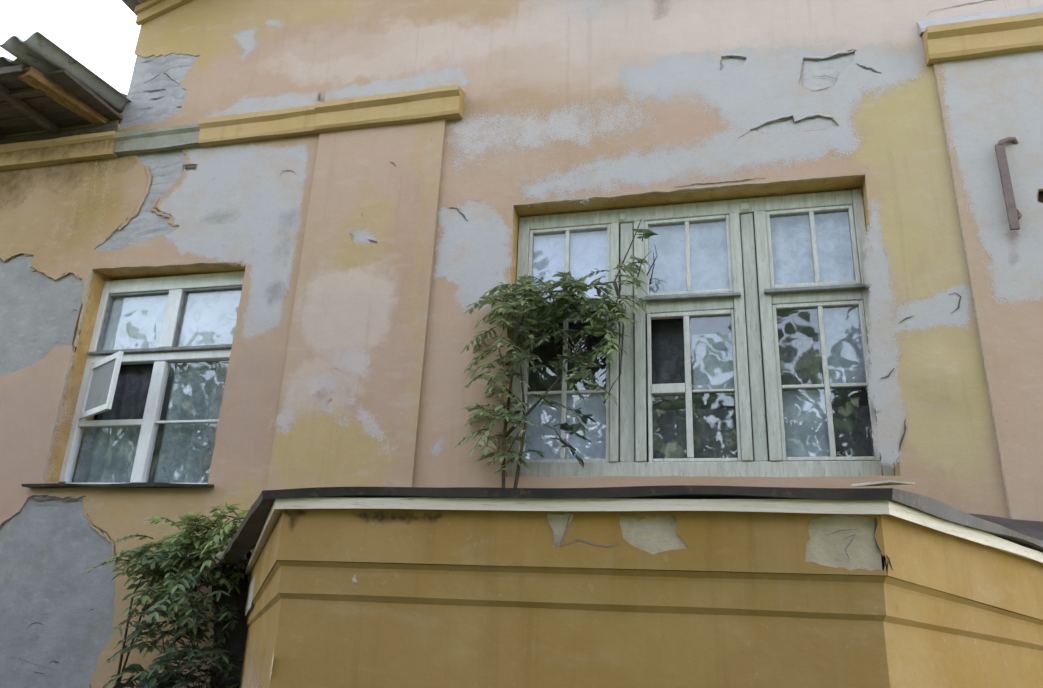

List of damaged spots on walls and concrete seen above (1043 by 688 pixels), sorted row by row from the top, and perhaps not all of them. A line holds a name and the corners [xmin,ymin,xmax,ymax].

spalling [119,53,199,129]
peeling [445,36,1043,311]
peeling [95,142,310,339]
peeling [432,197,517,313]
peeling [860,198,976,470]
spalling [0,252,117,688]
peeling [245,574,256,616]
spalling [620,516,688,555]
spalling [805,515,883,571]